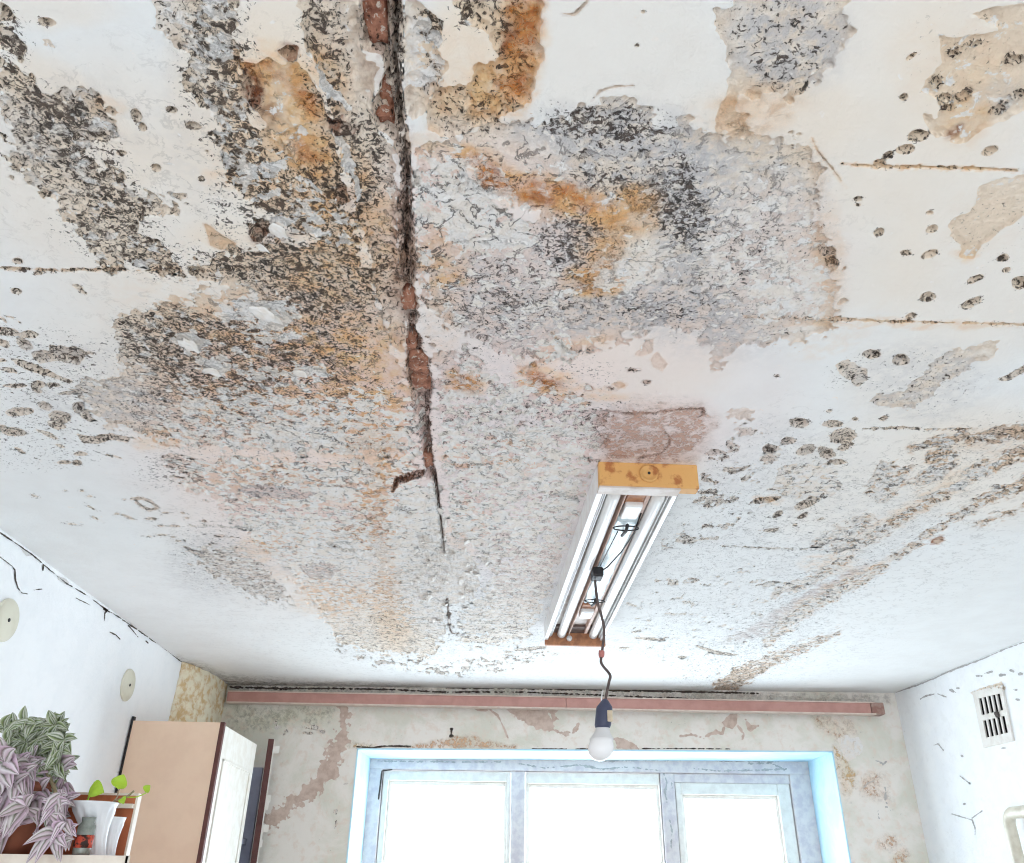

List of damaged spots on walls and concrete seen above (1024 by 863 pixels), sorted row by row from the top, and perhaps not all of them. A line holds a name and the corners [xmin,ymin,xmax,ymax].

peeling [873,3,1024,165]
crack [841,161,1018,172]
crack [357,0,491,552]
spalling [0,0,857,678]
spalling [835,349,910,387]
crack [745,315,1024,326]
spalling [869,340,1000,421]
water stain [603,410,705,462]
crack [0,532,182,662]
water stain [181,540,294,606]
peeling [619,408,1024,691]
water stain [416,737,514,749]